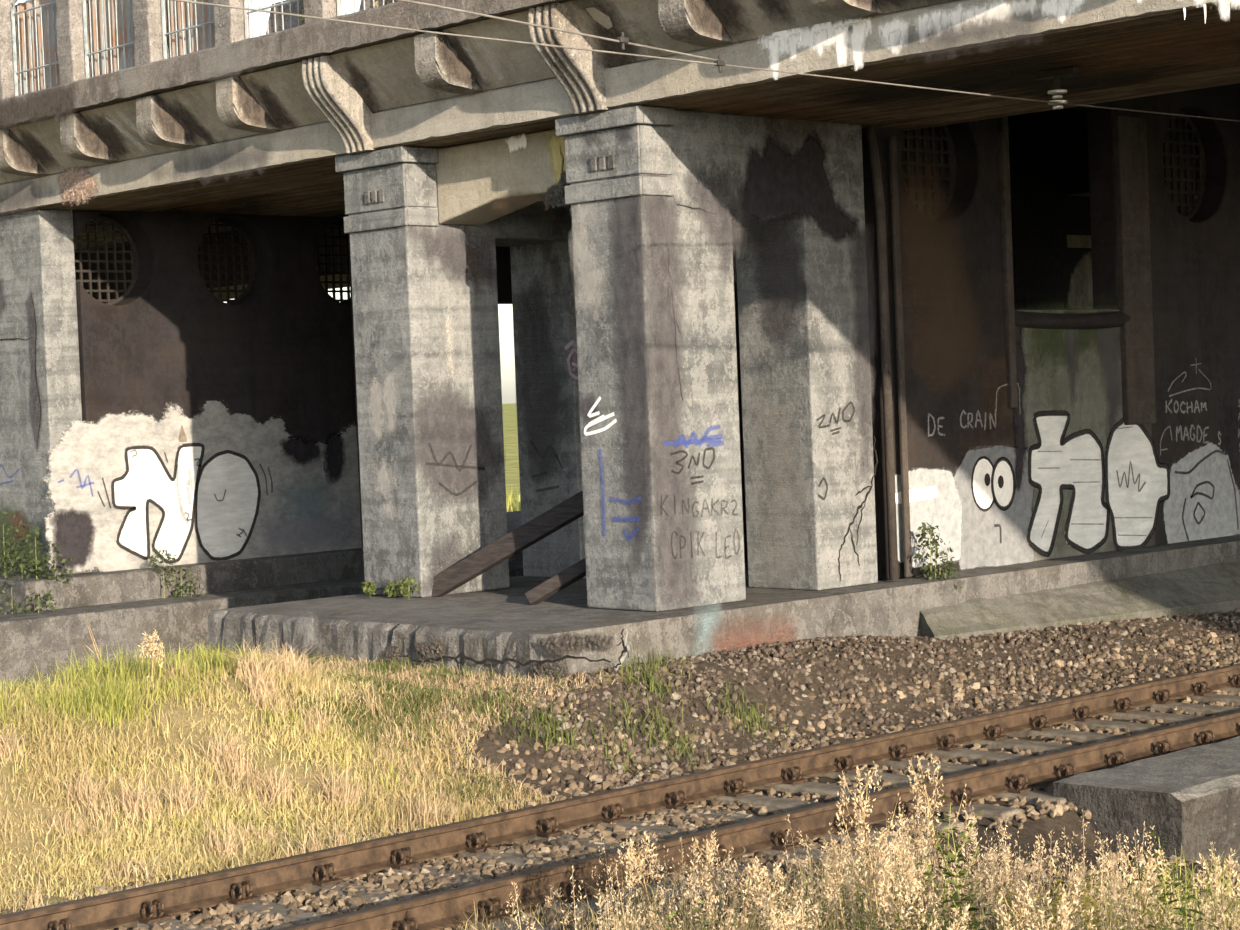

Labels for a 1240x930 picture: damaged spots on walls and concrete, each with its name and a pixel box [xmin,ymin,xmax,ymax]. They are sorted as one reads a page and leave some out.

water stain [688,0,743,38]
water stain [1181,0,1240,24]
water stain [758,0,1175,107]
spalling [58,167,99,205]
water stain [689,172,806,340]
crack [396,629,630,673]